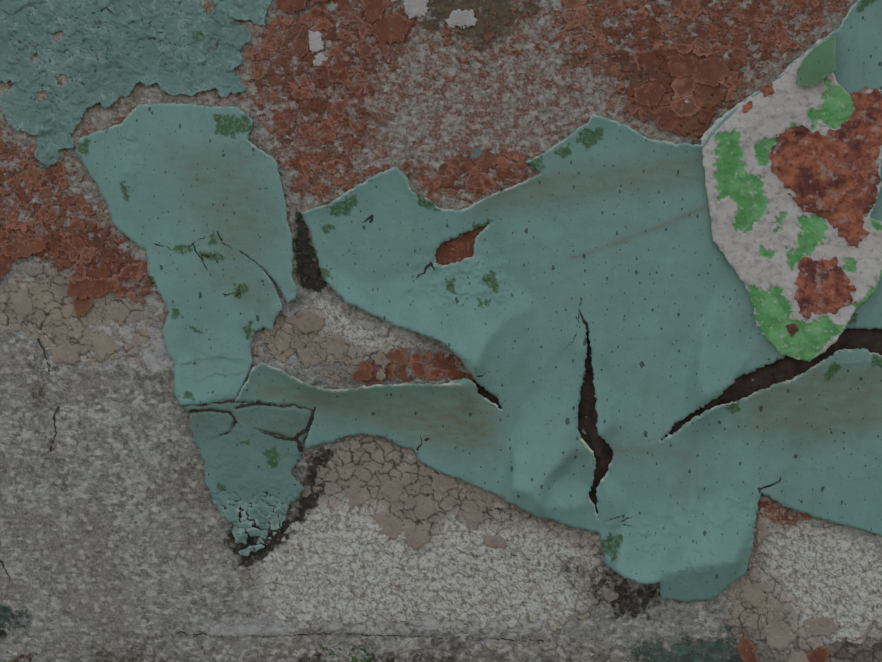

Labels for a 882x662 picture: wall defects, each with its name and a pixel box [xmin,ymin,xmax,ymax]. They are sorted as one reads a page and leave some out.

peeling [423,9,535,85]
peeling [552,0,825,94]
peeling [633,82,666,107]
peeling [0,0,272,281]
peeling [261,108,298,144]
peeling [66,267,117,317]
peeling [352,351,391,382]
crack [189,399,276,435]
crack [176,406,629,662]
peeling [481,535,508,549]
crack [714,509,882,662]